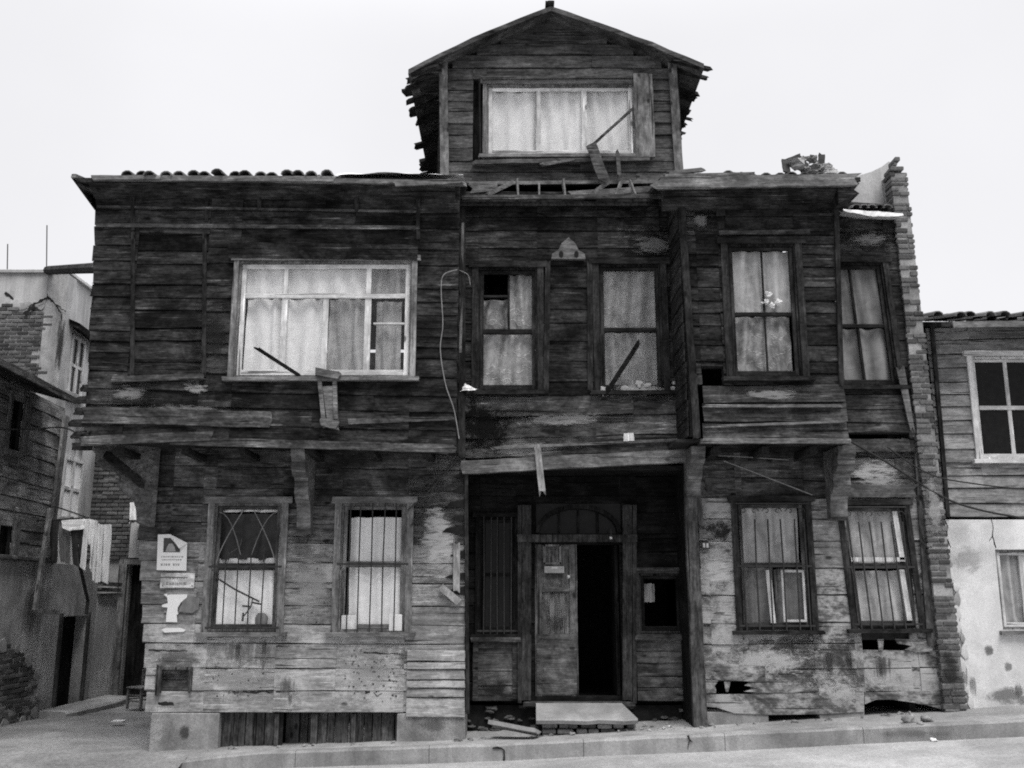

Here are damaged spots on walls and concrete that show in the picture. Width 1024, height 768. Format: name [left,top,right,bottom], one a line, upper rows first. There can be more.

flaking render [0,299,53,377]
leakage [771,643,797,654]
leakage [821,639,852,674]
leakage [876,658,890,674]
leakage [943,652,958,682]
flaking render [0,638,42,727]
leakage [989,685,1024,705]